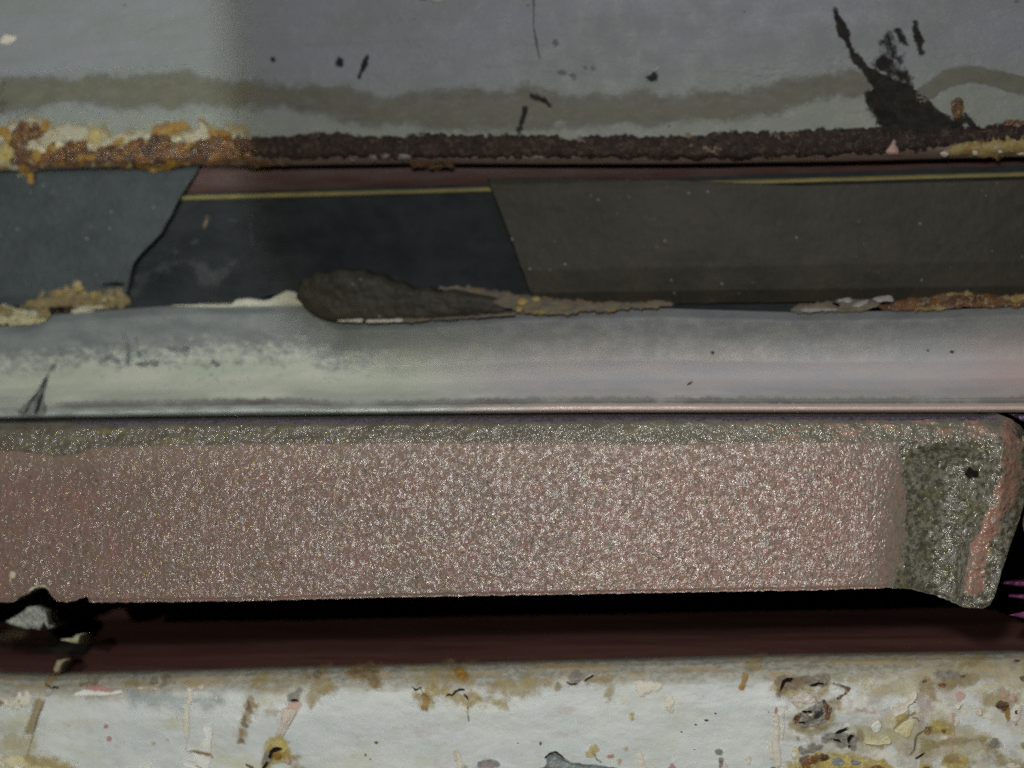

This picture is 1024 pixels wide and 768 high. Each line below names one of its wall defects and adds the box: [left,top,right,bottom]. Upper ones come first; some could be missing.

leakage [0,71,872,130]
leakage [917,66,1024,103]
rust [0,98,1024,184]
peeling [55,281,107,313]
peeling [61,632,92,644]
rust [788,737,893,768]
rust [921,713,1007,768]